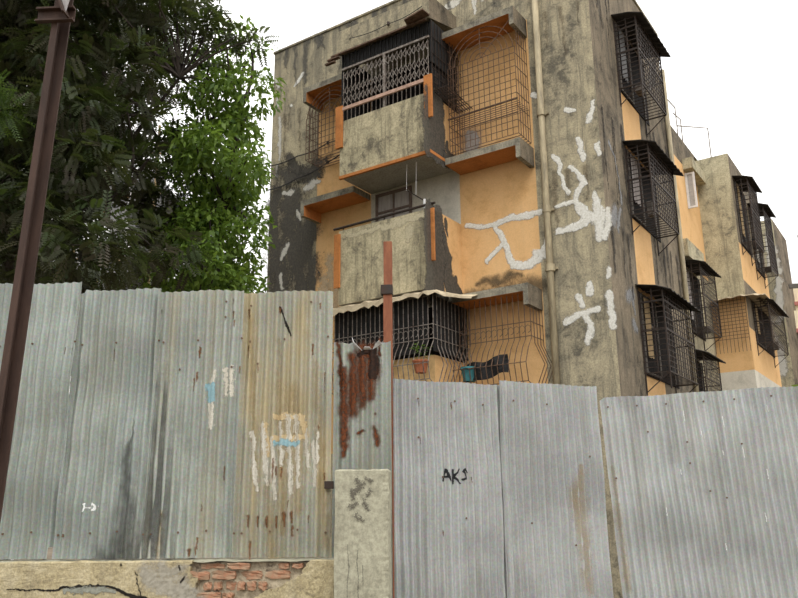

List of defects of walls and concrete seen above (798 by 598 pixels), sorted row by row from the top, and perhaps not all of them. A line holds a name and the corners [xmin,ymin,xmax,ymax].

damp [283,35,325,84]
damp [261,117,332,292]
damp [601,107,638,332]
damp [653,236,682,297]
corrosion [336,338,381,458]
crack [6,563,147,598]
spalling [186,562,307,598]